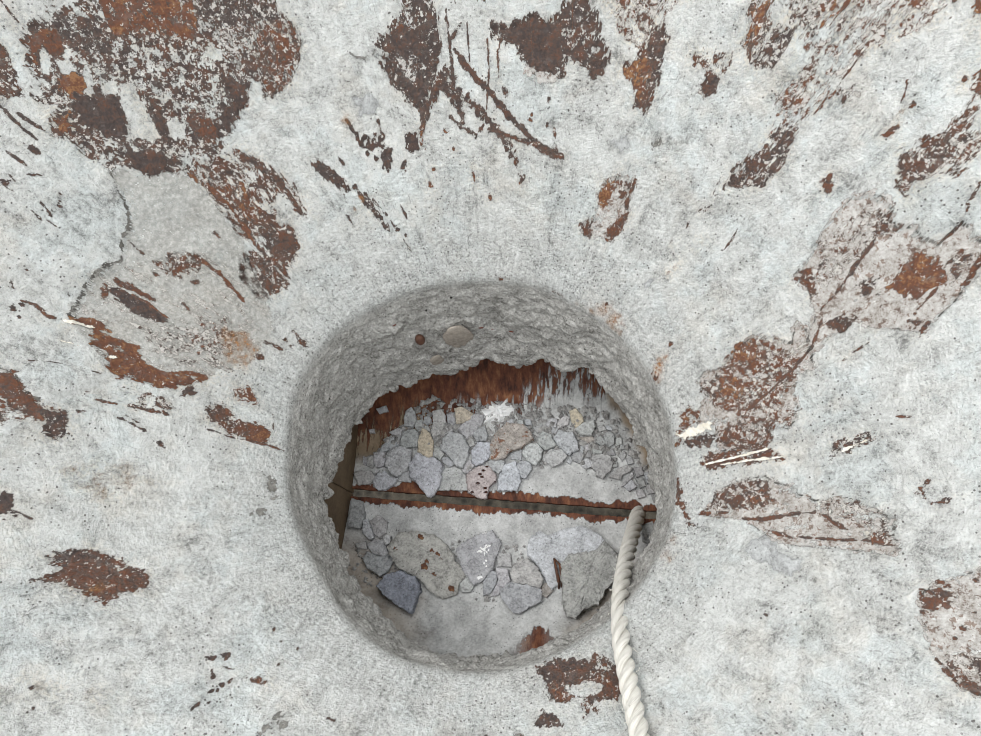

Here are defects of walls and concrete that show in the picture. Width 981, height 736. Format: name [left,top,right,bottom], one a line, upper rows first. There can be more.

rust [342,0,449,173]
rust [490,0,678,116]
rust [686,0,957,194]
rust [0,0,308,441]
rust [675,69,981,557]
rust [205,385,284,451]
spalling [408,453,445,498]
spalling [466,422,543,500]
rust [30,548,149,606]
spalling [347,498,618,619]
rust [534,652,621,728]
rust [914,567,981,699]